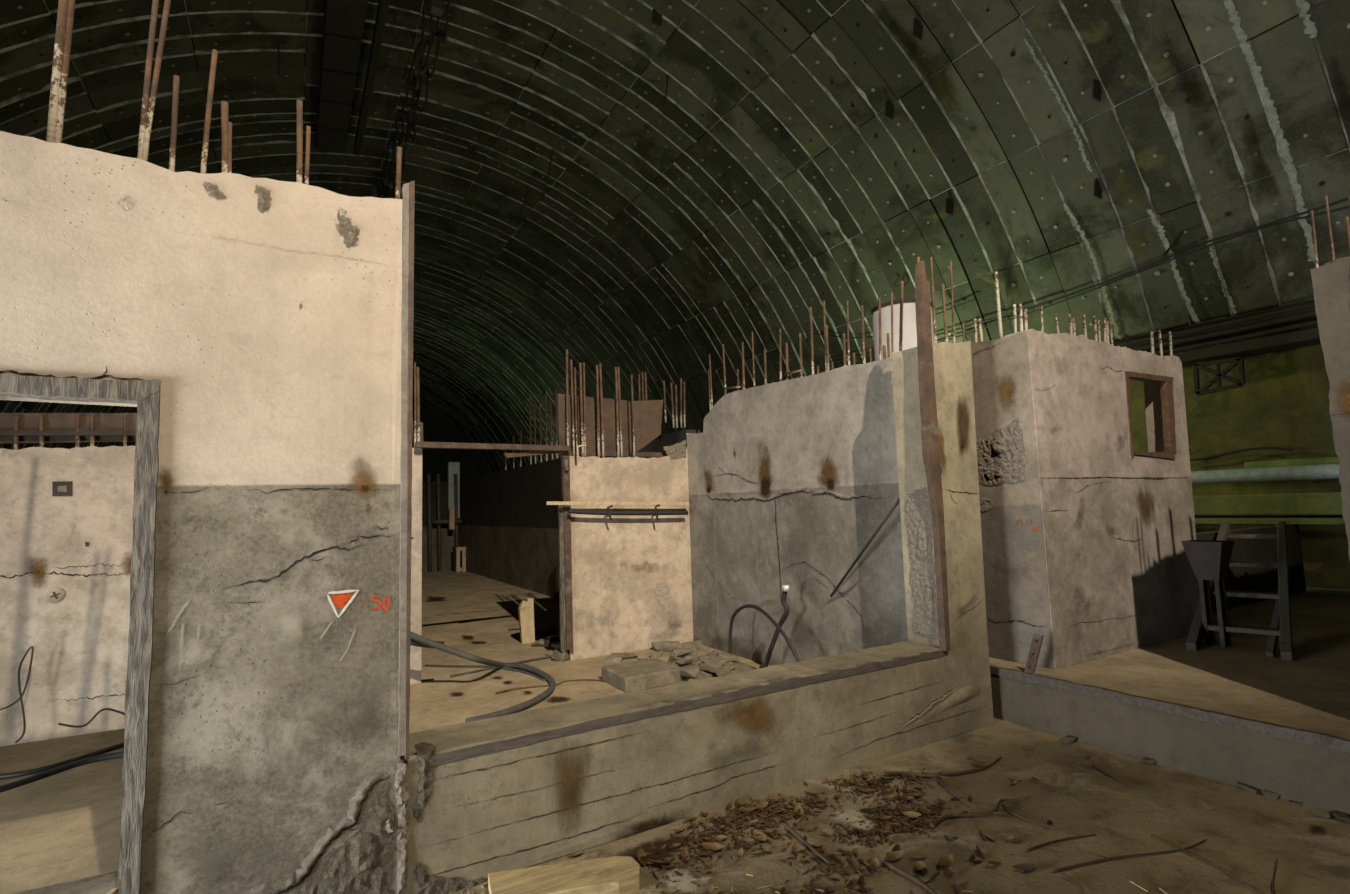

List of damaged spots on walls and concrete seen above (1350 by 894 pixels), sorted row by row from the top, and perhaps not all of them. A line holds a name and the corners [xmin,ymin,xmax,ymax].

spalling [200,49,232,199]
spalling [255,184,272,213]
crack [164,486,386,494]
rust [759,455,771,496]
rust [820,459,836,489]
rust [939,403,969,473]
spalling [976,418,1026,512]
crack [223,525,392,604]
crack [705,470,886,633]
spalling [904,488,939,639]
rust [556,757,582,817]
crack [247,767,390,894]